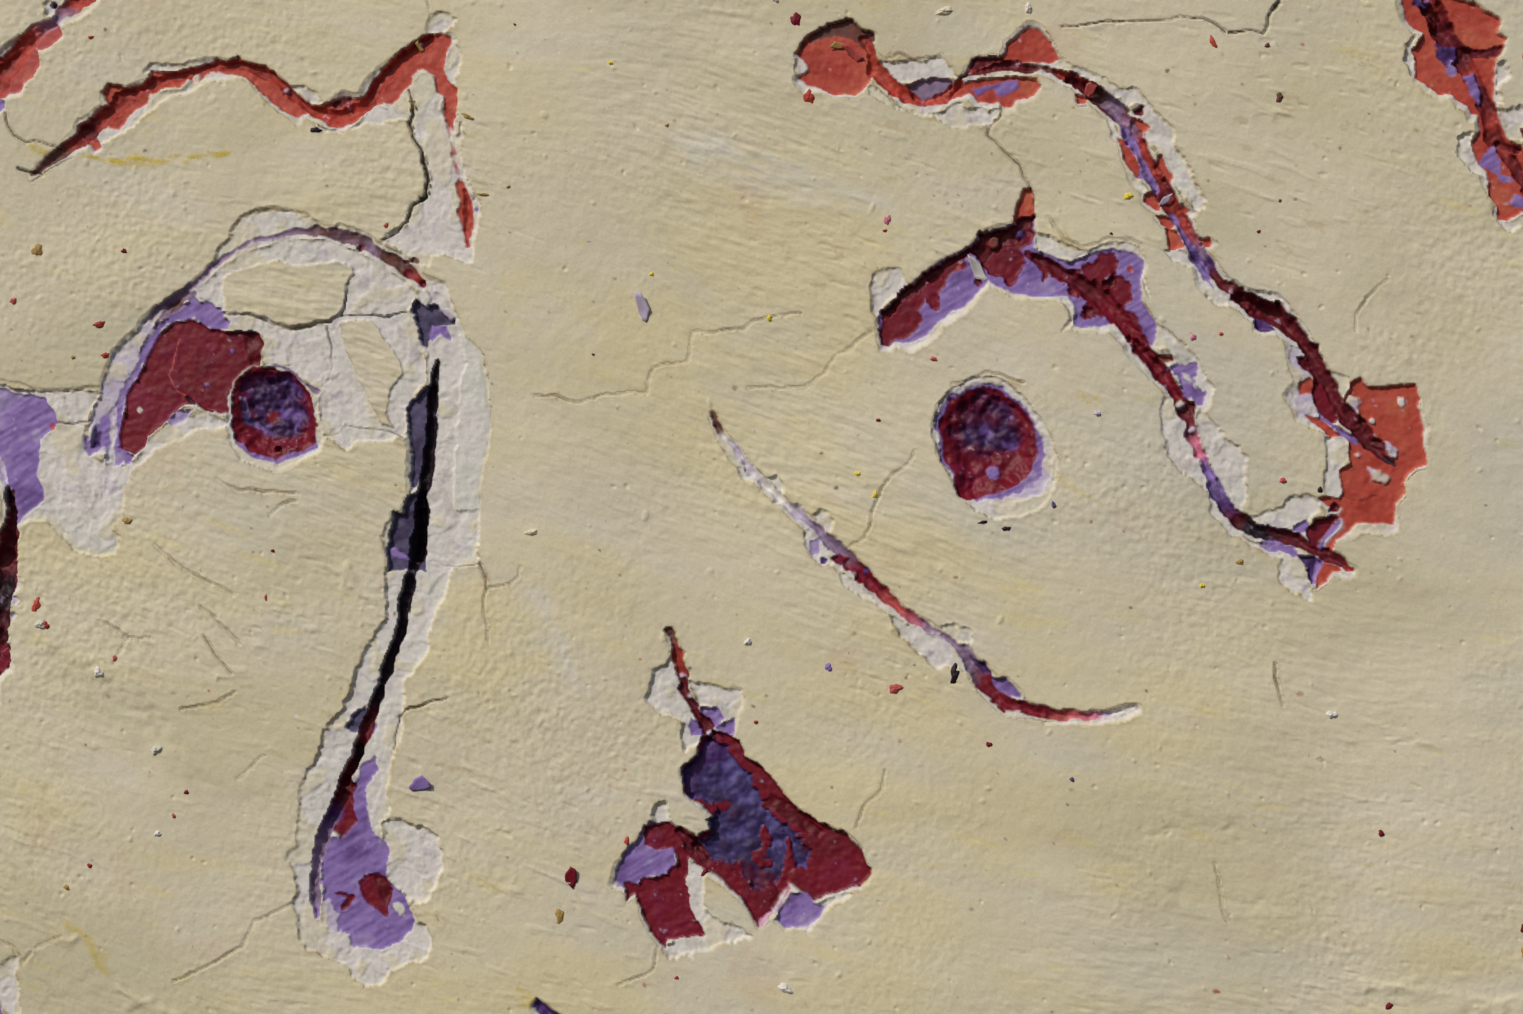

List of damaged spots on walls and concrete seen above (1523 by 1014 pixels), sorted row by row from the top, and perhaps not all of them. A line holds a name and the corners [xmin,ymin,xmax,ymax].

peeling [384,73,481,267]
peeling [829,41,864,62]
crack [1395,0,1523,233]
peeling [968,255,988,281]
crack [746,0,1430,601]
peeling [0,287,265,705]
crack [708,409,1142,726]
crack [1273,661,1285,707]
peeling [409,775,431,791]
peeling [608,626,873,960]
crack [853,769,886,829]
crack [1213,862,1230,923]